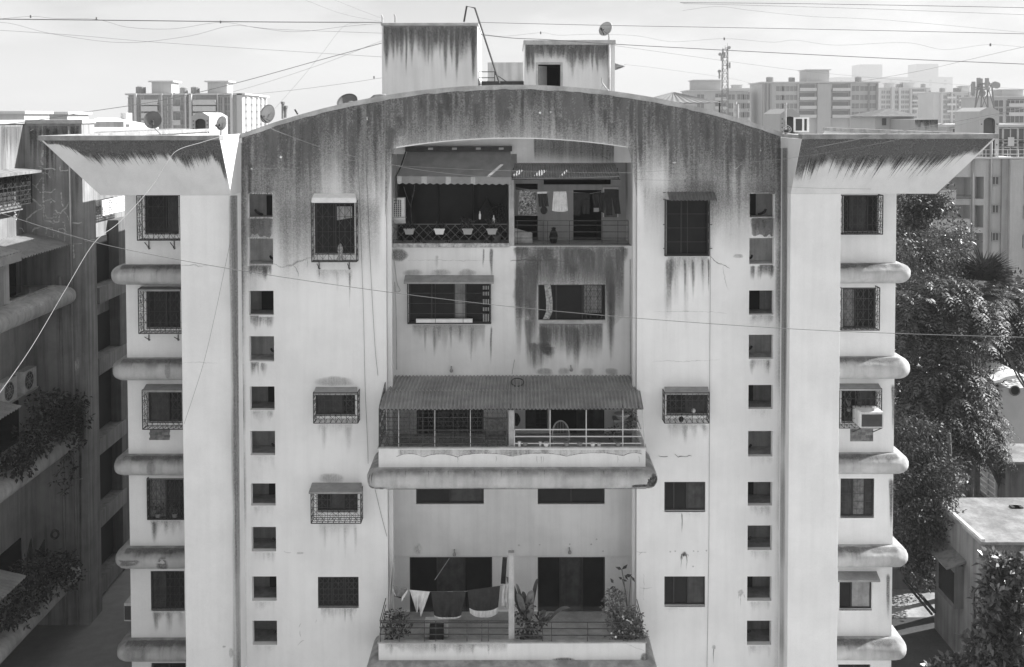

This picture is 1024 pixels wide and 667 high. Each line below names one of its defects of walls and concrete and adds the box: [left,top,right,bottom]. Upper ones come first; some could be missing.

leakage [383,26,477,66]
leakage [525,45,608,66]
leakage [2,126,225,175]
leakage [802,153,959,175]
leakage [230,89,787,596]